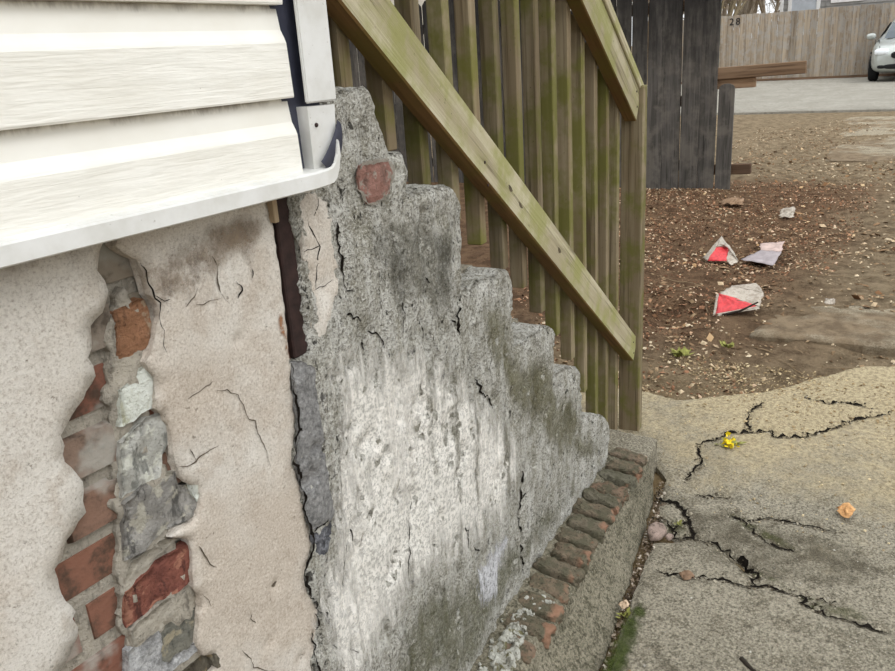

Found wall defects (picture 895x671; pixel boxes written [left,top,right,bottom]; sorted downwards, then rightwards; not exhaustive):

crack [140,258,254,350]
spalling [99,286,221,671]
crack [180,446,218,467]
crack [189,382,271,466]
crack [291,363,357,671]
crack [475,379,492,406]
crack [517,466,526,574]